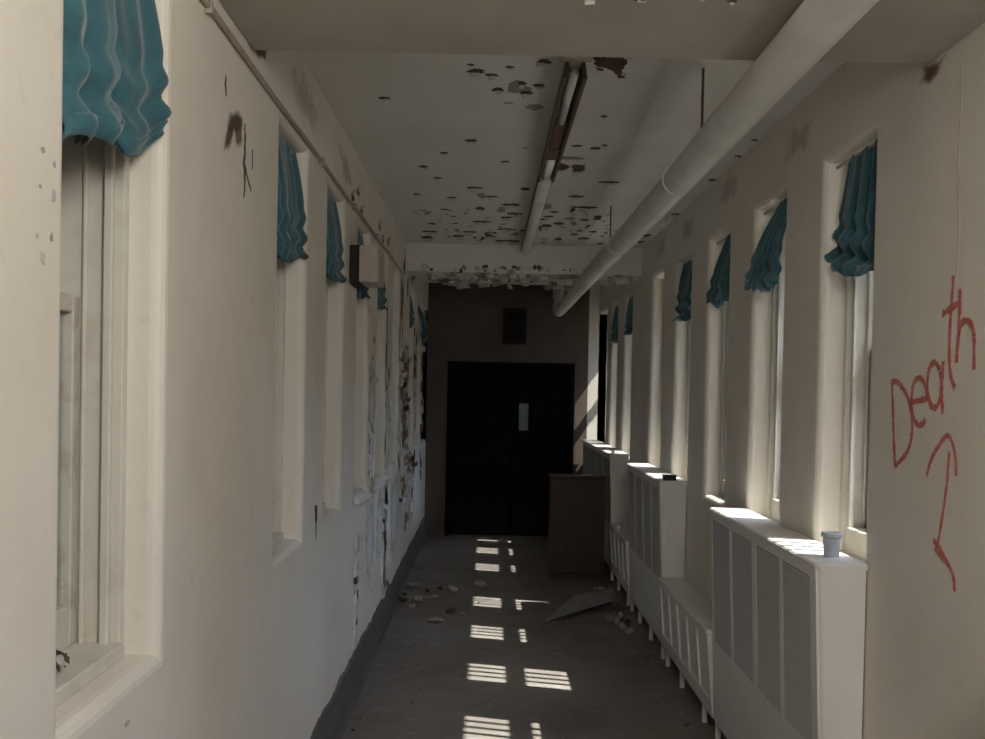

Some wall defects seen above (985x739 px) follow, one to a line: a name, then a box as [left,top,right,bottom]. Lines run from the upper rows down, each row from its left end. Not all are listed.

peeling [467,64,545,111]
flaking render [593,57,632,79]
peeling [558,144,608,176]
peeling [412,187,525,246]
peeling [538,195,618,245]
peeling [420,262,586,292]
flaking render [353,327,426,599]